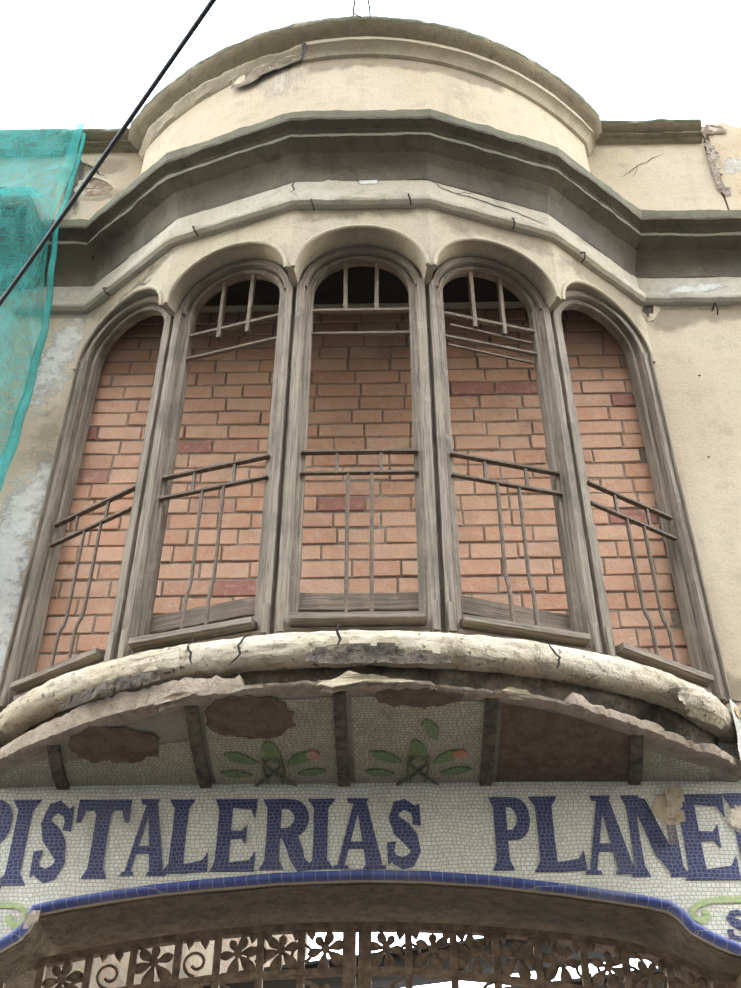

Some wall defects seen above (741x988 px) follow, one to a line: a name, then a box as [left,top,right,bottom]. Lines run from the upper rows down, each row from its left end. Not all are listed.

flaking render [74,175,121,202]
flaking render [701,125,732,195]
spalling [0,636,741,779]